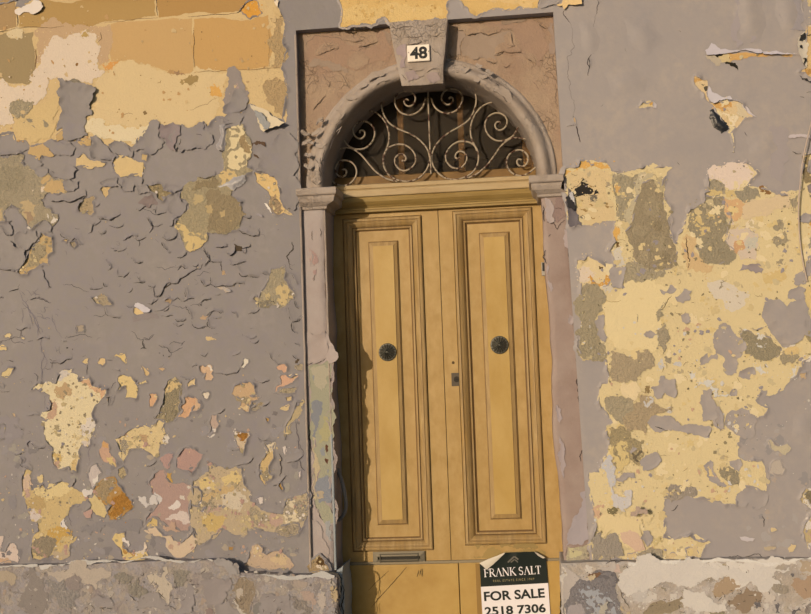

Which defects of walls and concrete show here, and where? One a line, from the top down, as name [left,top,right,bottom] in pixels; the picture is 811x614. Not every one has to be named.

peeling [396,37,440,83]
peeling [433,0,548,82]
peeling [728,51,793,62]
peeling [695,77,753,153]
flaking render [0,0,326,341]
peeling [545,198,555,223]
crack [0,206,325,406]
peeling [562,149,811,614]
peeling [0,319,336,614]